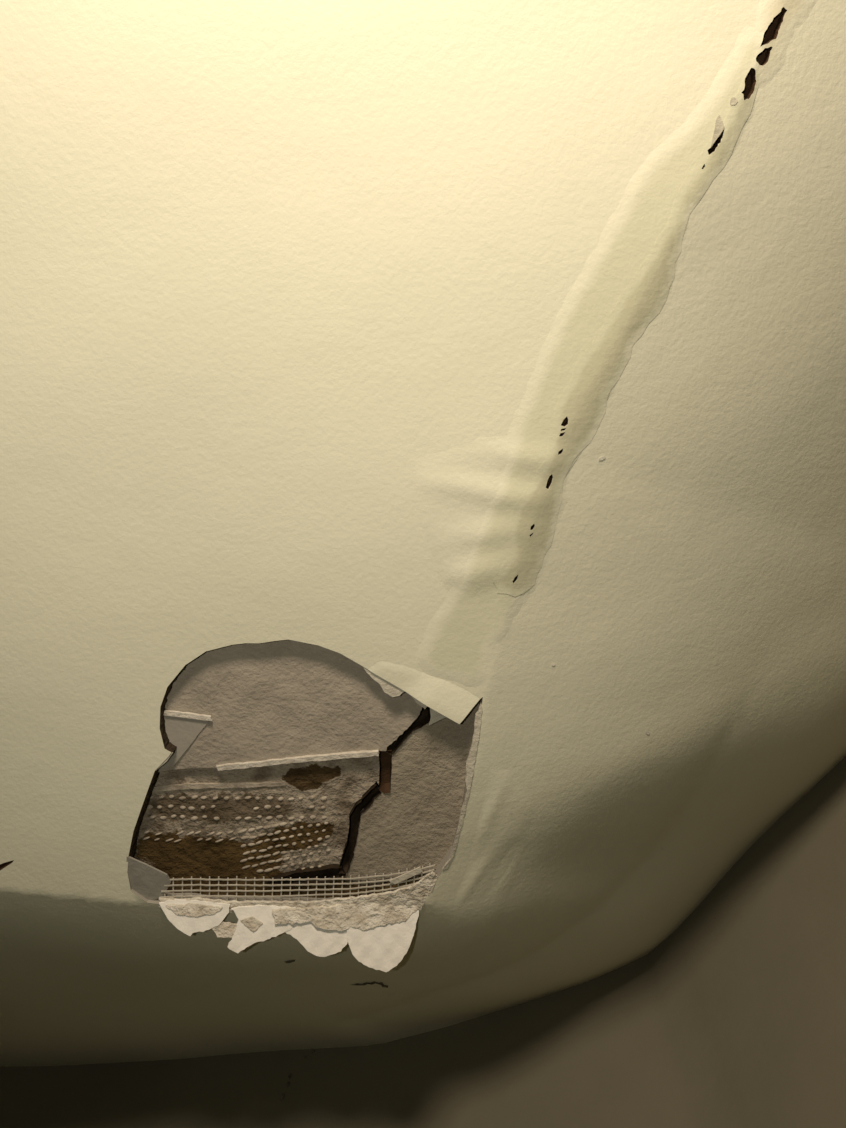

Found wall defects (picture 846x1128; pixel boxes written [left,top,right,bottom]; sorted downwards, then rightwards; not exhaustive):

crack [702,7,787,169]
leakage [415,0,818,687]
crack [546,417,568,489]
spalling [160,648,218,757]
spalling [128,768,160,857]
peeling [433,697,483,877]
flaking render [127,871,419,972]